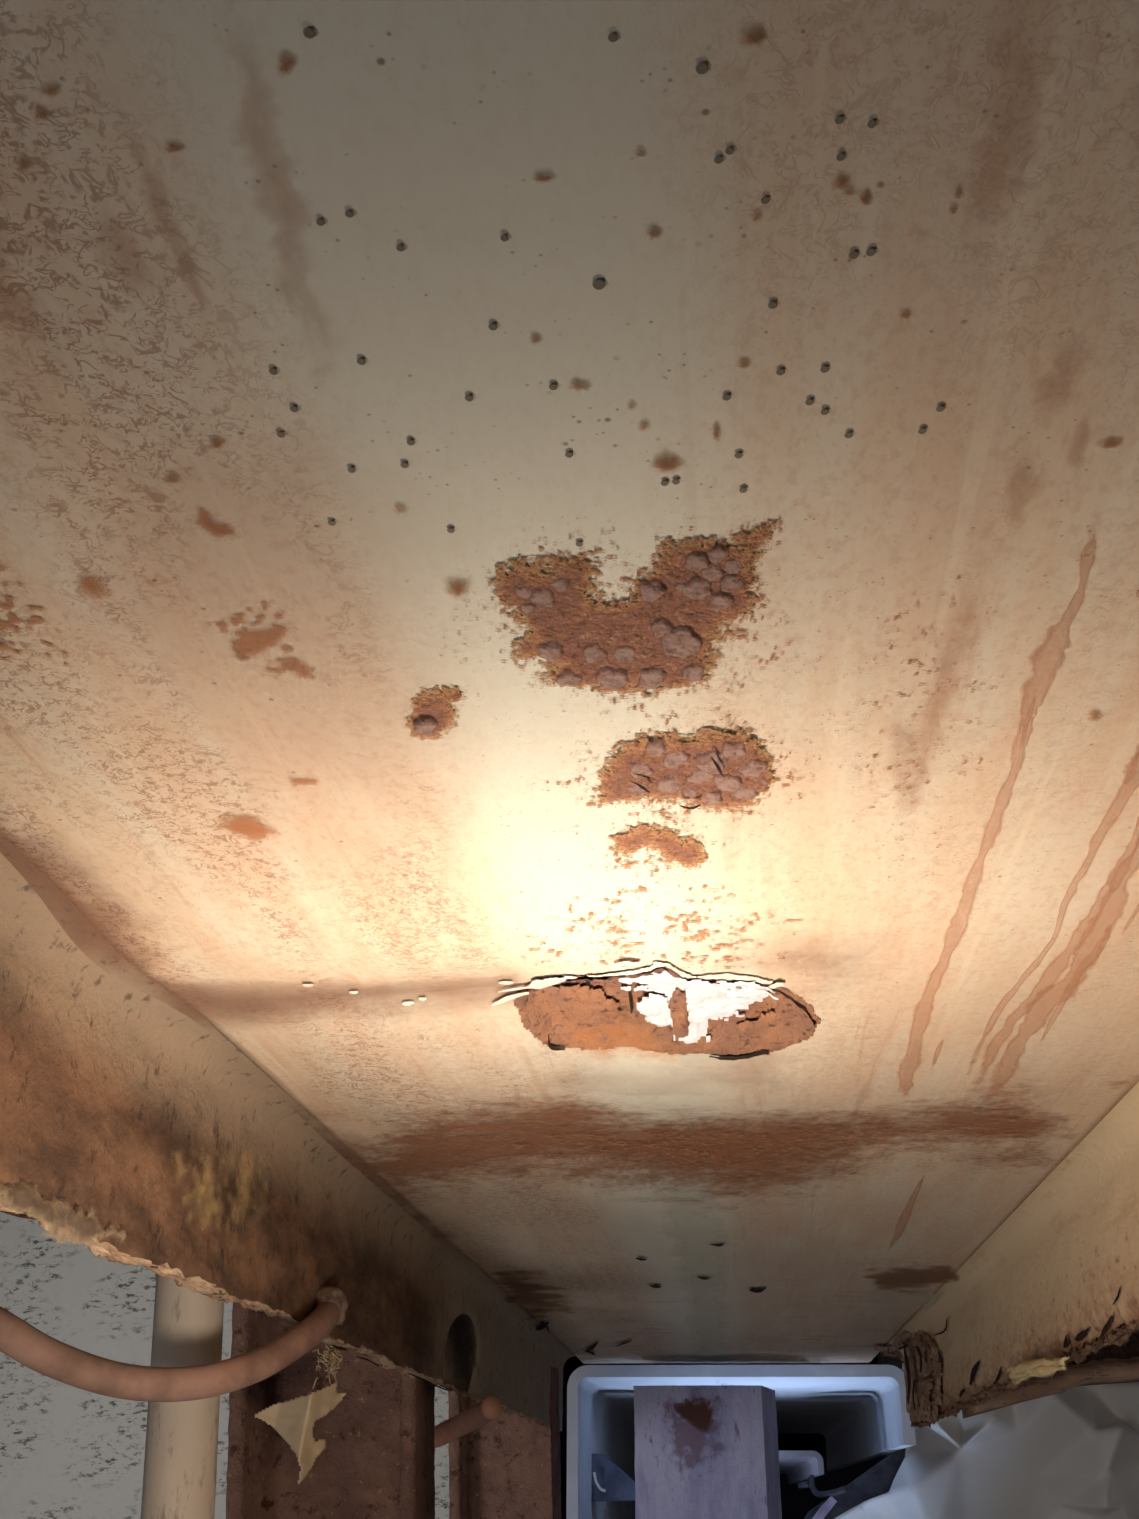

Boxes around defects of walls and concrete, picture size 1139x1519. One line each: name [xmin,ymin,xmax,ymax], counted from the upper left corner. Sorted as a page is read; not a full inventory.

rust [209,603,329,679]
rust [404,686,479,740]
rust [440,518,820,970]
rust [829,612,997,861]
peeling [492,962,821,1061]
rust [326,1095,1063,1202]
peeling [874,1330,943,1422]
peeling [1005,1357,1070,1386]